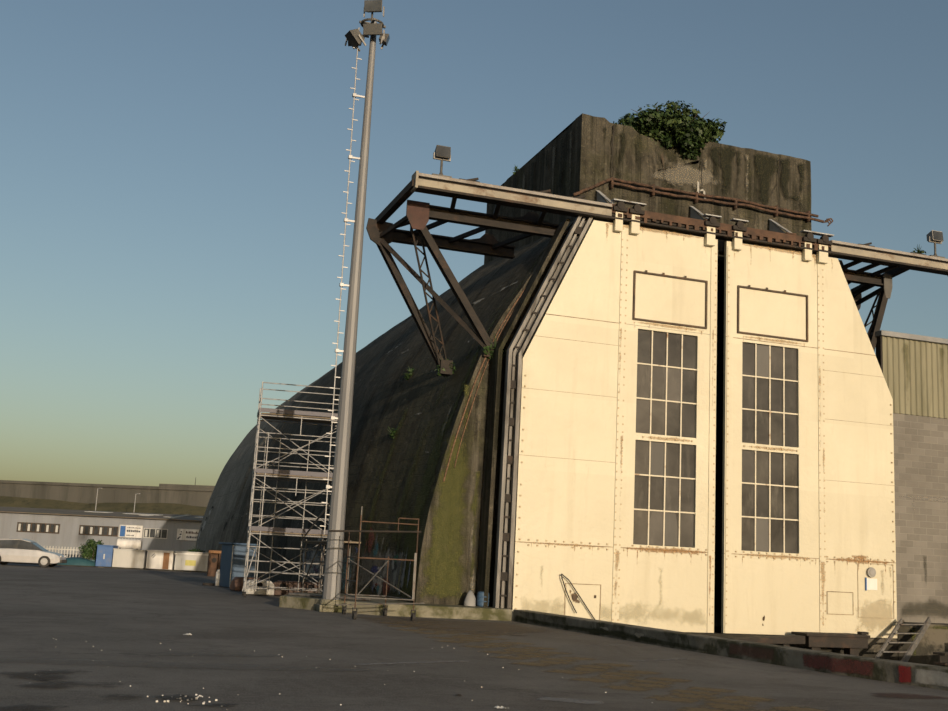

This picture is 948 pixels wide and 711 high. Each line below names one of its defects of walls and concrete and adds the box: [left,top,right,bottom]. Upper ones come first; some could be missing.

rust [611,205,831,251]
rust [627,548,711,568]
rust [834,555,889,571]